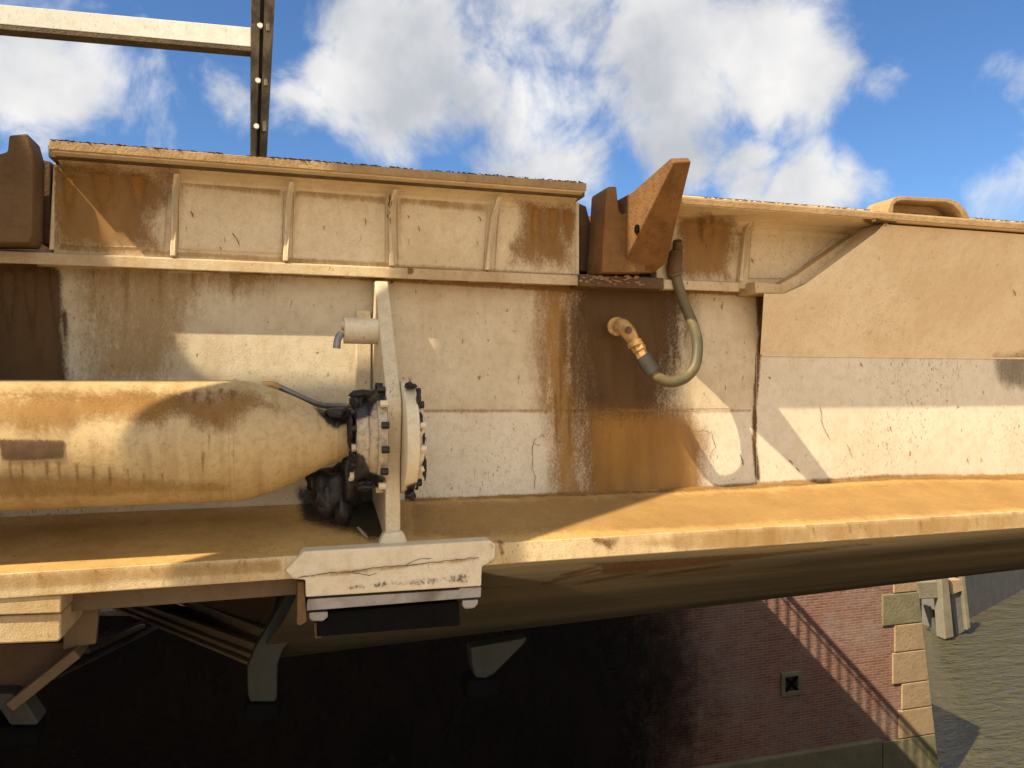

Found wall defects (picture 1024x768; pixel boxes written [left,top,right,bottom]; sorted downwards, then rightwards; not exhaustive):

corrosion [54,164,172,248]
corrosion [512,202,574,266]
corrosion [242,213,1024,555]
crack [297,557,479,579]